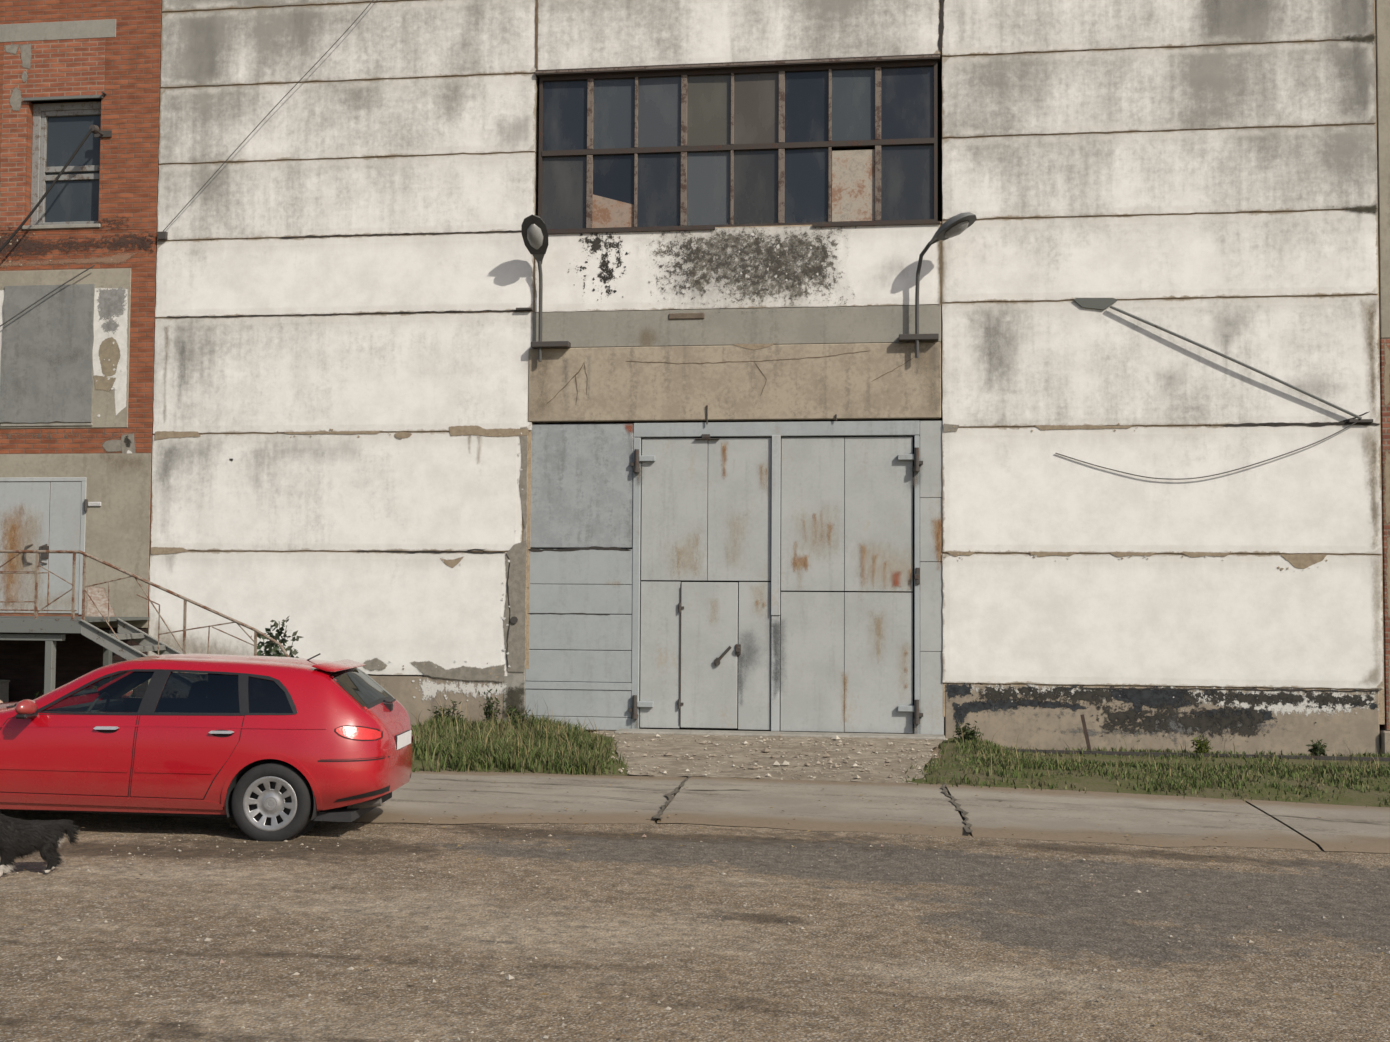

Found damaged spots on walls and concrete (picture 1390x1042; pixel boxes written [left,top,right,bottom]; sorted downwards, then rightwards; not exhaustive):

water stain [568,232,629,301]
peeling [94,337,120,391]
peeling [958,683,1135,716]
peeling [1153,686,1379,723]